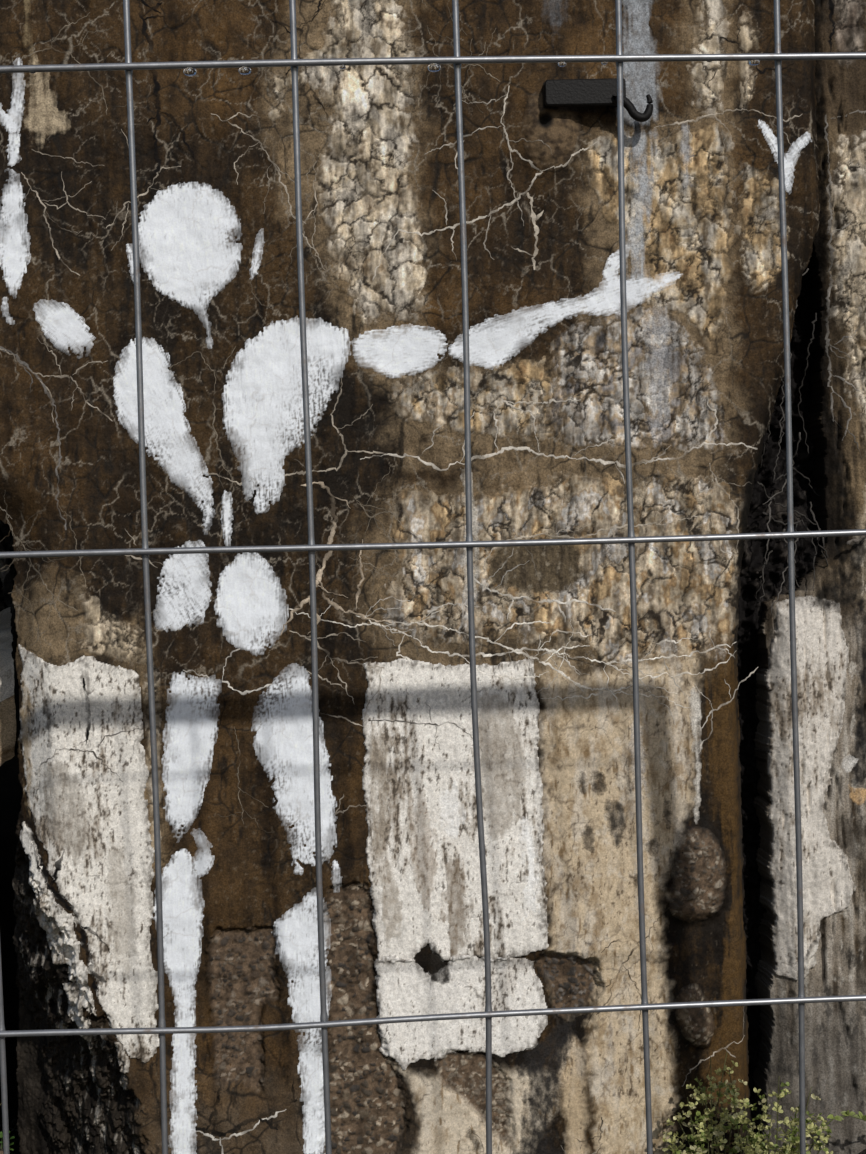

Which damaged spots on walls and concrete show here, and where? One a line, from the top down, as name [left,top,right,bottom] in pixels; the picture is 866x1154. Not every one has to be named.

crack [0,338,112,647]
crack [21,0,197,276]
peeling [264,0,432,327]
crack [373,0,597,279]
crack [280,377,758,754]
flaking render [324,0,793,1154]
leakage [613,0,665,280]
leakage [639,292,680,449]
crack [654,15,866,459]
spalling [206,926,281,1094]
leakage [427,941,452,984]
leakage [512,1014,579,1154]